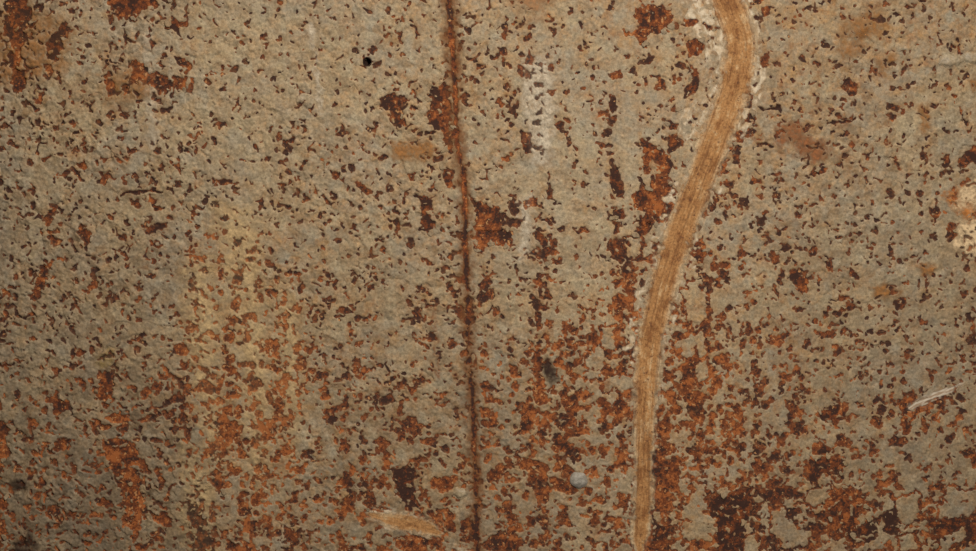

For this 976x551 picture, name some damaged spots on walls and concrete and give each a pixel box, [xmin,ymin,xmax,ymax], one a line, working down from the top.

corrosion [0,0,36,97]
corrosion [44,22,72,79]
corrosion [104,56,192,101]
corrosion [502,131,538,161]
crack [441,0,481,551]
corrosion [219,210,267,437]
corrosion [896,390,942,433]
corrosion [96,366,151,542]
corrosion [181,469,231,551]
corrosion [703,482,766,551]
corrosion [800,401,870,543]
corrosion [922,513,976,551]